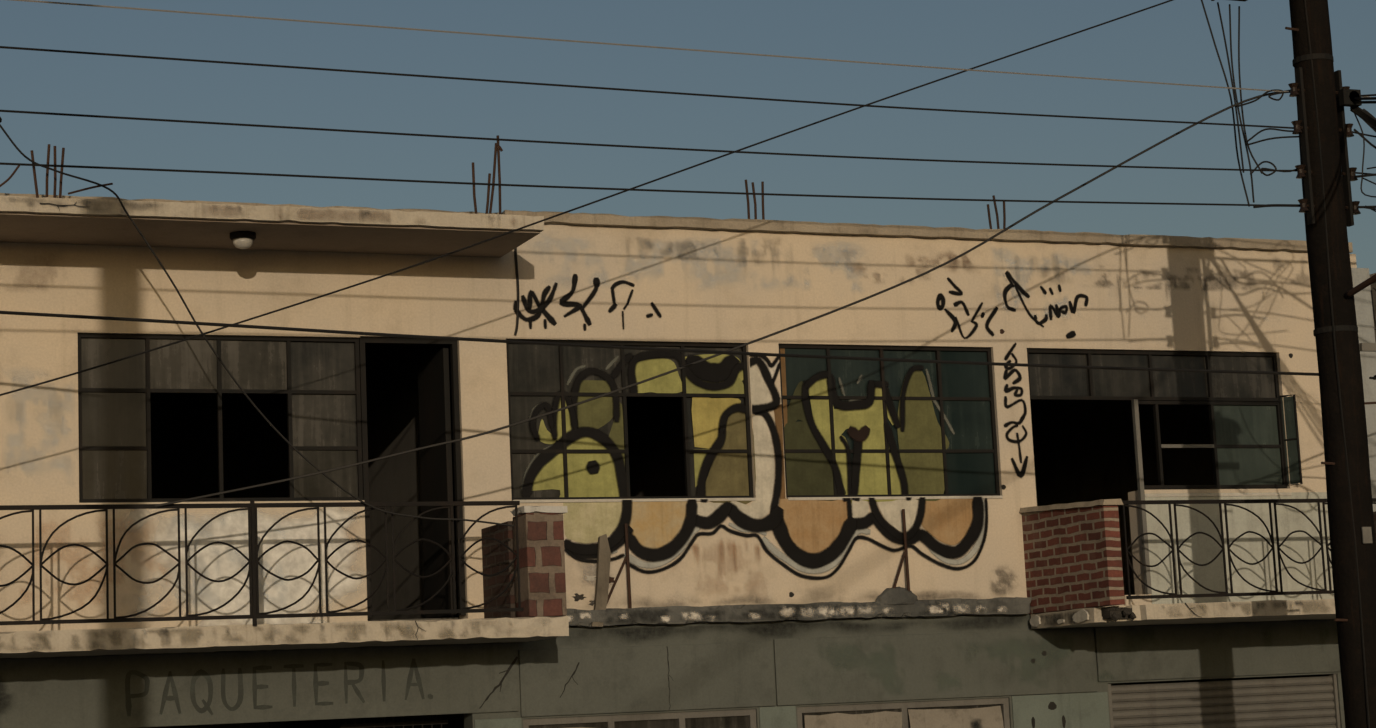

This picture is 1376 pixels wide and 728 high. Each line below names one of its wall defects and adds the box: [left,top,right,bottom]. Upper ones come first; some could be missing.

spalling [620,611,718,621]